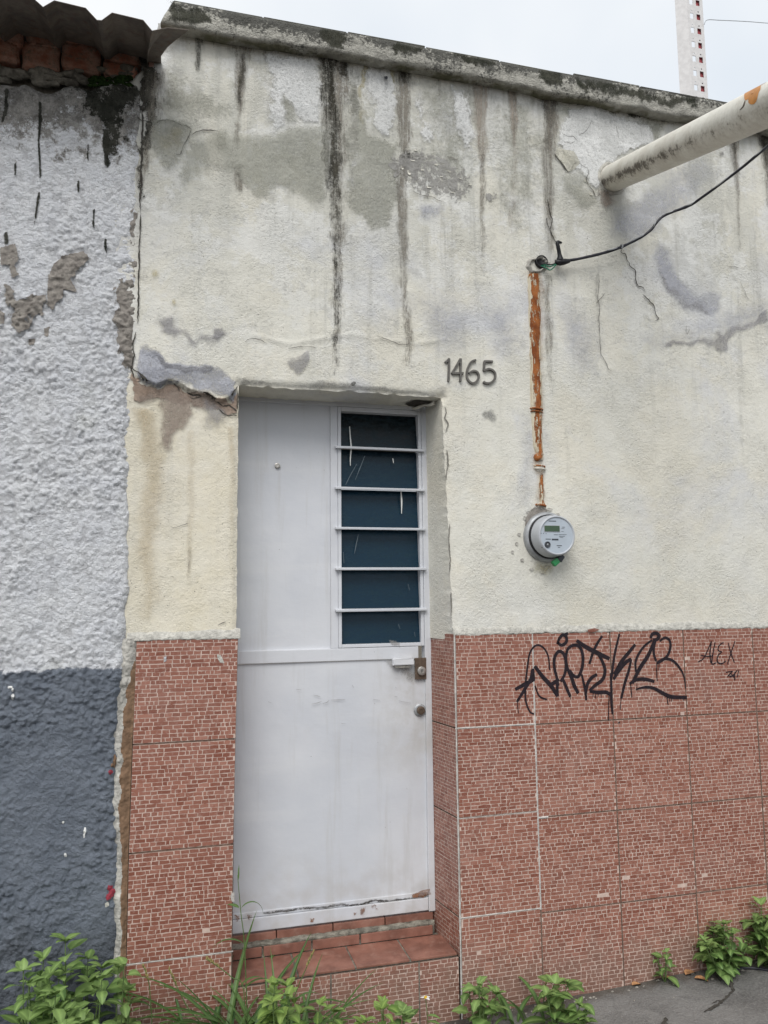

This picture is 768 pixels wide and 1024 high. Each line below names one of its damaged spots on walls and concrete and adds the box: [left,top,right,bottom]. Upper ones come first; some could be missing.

spalling [130,208,138,246]
damp [71,57,211,197]
damp [231,29,411,360]
peeling [555,106,654,206]
spalling [0,243,89,345]
spalling [112,260,237,415]
damp [161,318,224,343]
damp [289,351,309,373]
crack [621,250,659,321]
damp [141,389,191,448]